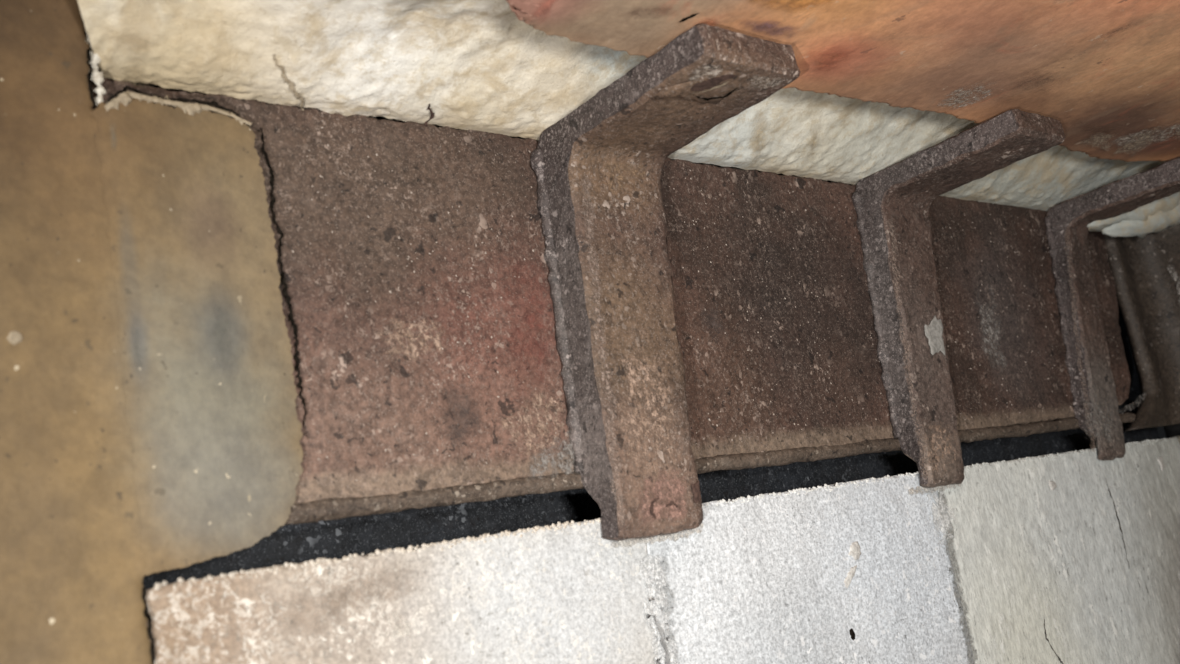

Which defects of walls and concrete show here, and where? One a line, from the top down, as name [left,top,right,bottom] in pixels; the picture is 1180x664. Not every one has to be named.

crack [86,43,308,438]
corrosion [642,472,686,521]